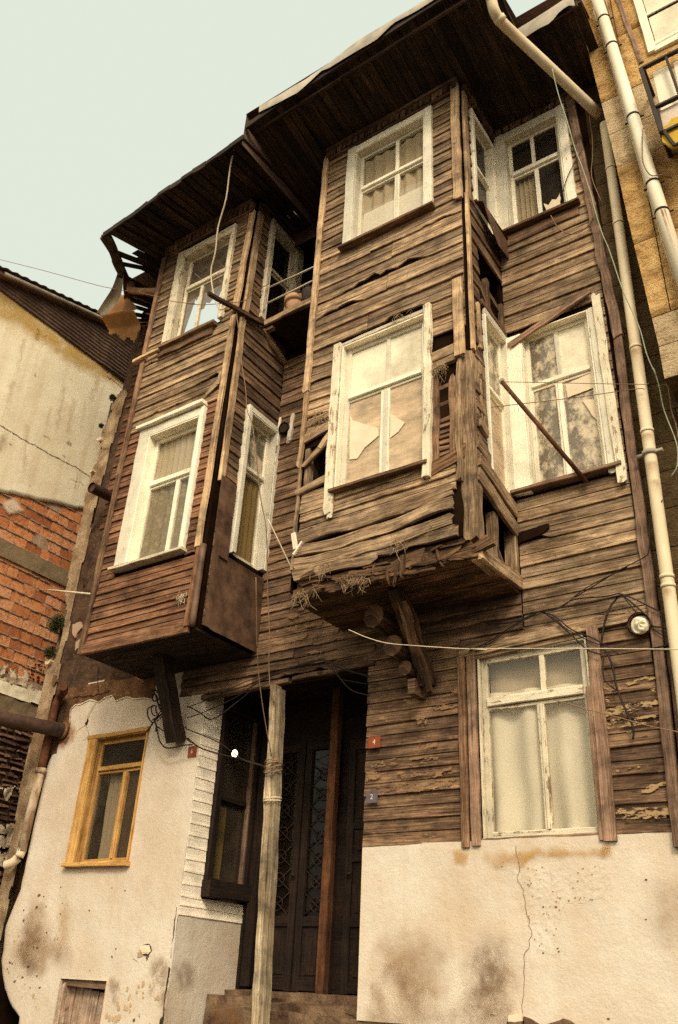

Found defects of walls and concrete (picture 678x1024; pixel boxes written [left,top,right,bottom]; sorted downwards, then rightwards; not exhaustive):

flaking render [72,622,83,652]
peeling [603,677,659,734]
peeling [366,742,455,793]
peeling [641,781,666,793]
peeling [616,806,669,819]